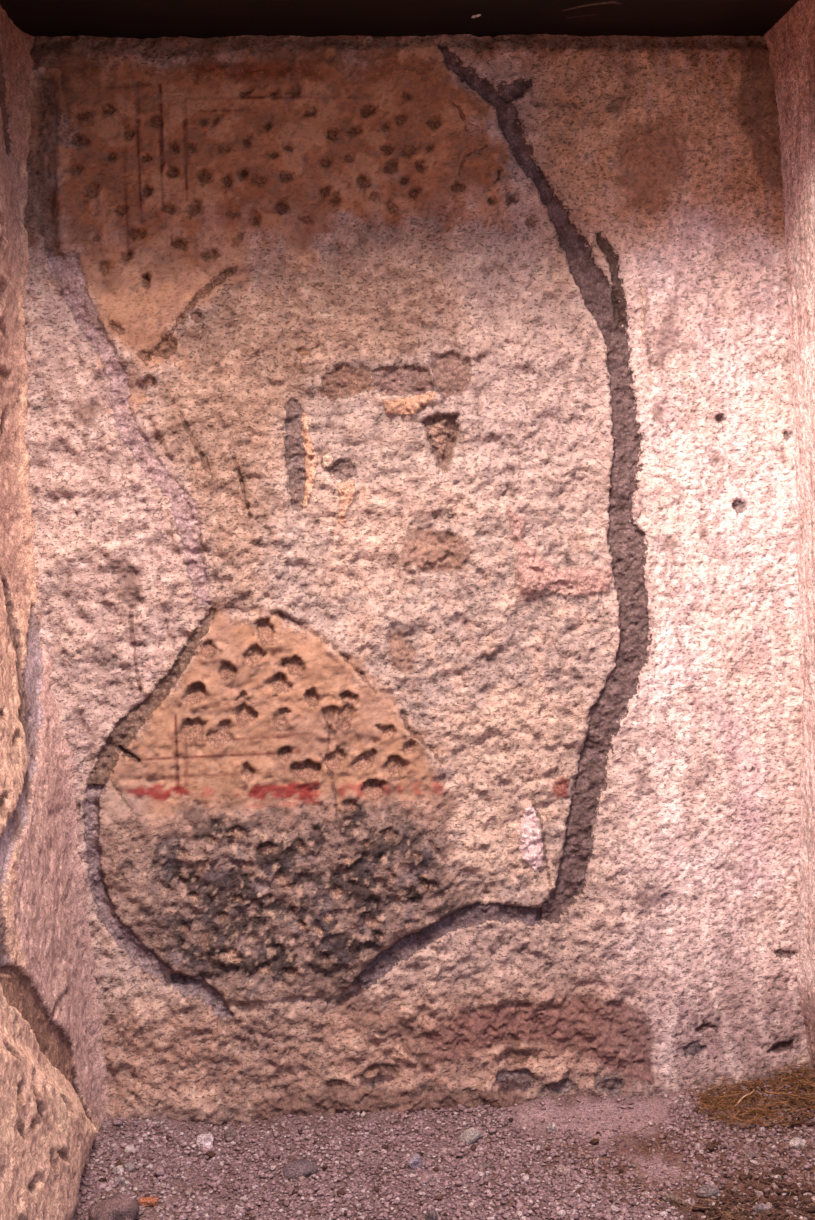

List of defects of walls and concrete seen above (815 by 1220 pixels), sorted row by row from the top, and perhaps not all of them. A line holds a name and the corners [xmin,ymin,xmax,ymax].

spalling [320,352,471,473]
crack [0,55,251,1020]
crack [351,43,653,989]
spalling [183,683,207,705]
spalling [177,695,257,747]
spalling [201,619,274,680]
spalling [272,656,305,694]
crack [274,611,377,693]
spalling [278,690,415,812]
crack [0,580,92,1123]
spalling [226,948,241,963]
spalling [17,1084,47,1139]